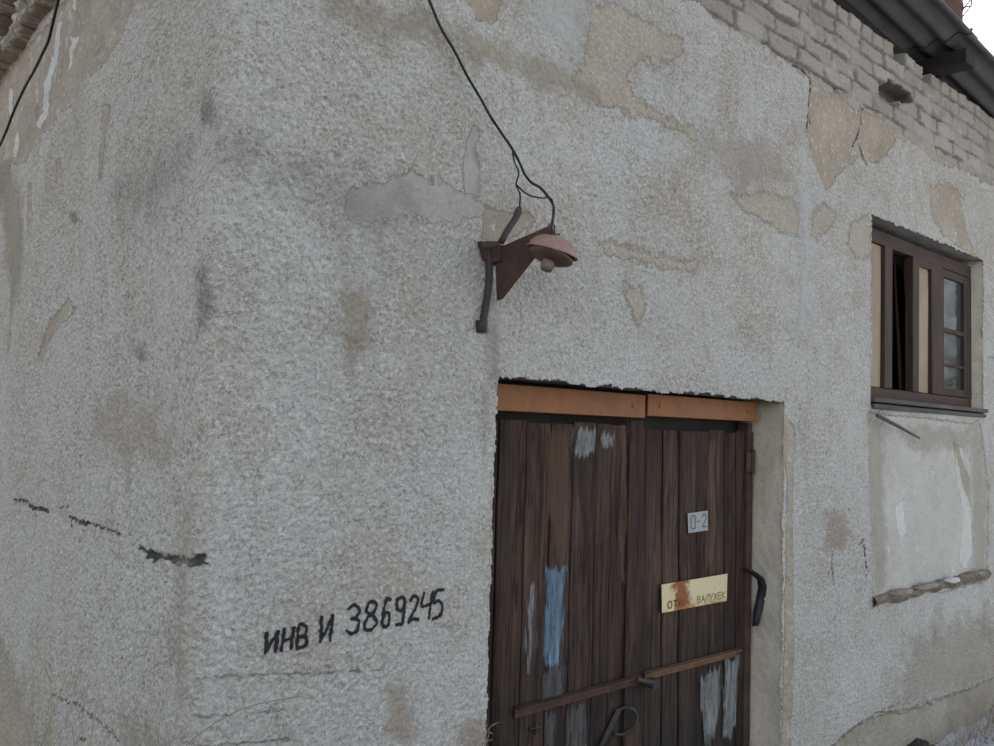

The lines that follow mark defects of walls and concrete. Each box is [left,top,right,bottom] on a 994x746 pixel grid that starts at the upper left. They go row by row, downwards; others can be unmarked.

peeling [465,0,502,24]
peeling [0,0,134,180]
peeling [807,78,955,190]
peeling [847,214,870,260]
peeling [930,182,975,255]
crack [13,499,208,568]
peeling [868,412,989,607]